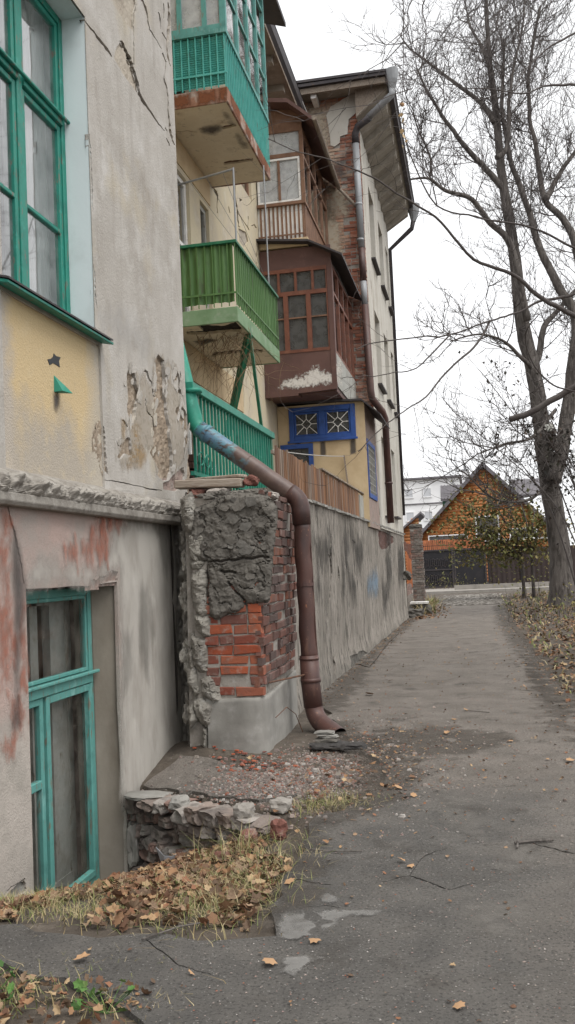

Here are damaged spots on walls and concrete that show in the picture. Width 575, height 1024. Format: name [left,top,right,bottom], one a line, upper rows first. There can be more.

flaking render [92,355,190,491]
peeling [216,495,256,557]